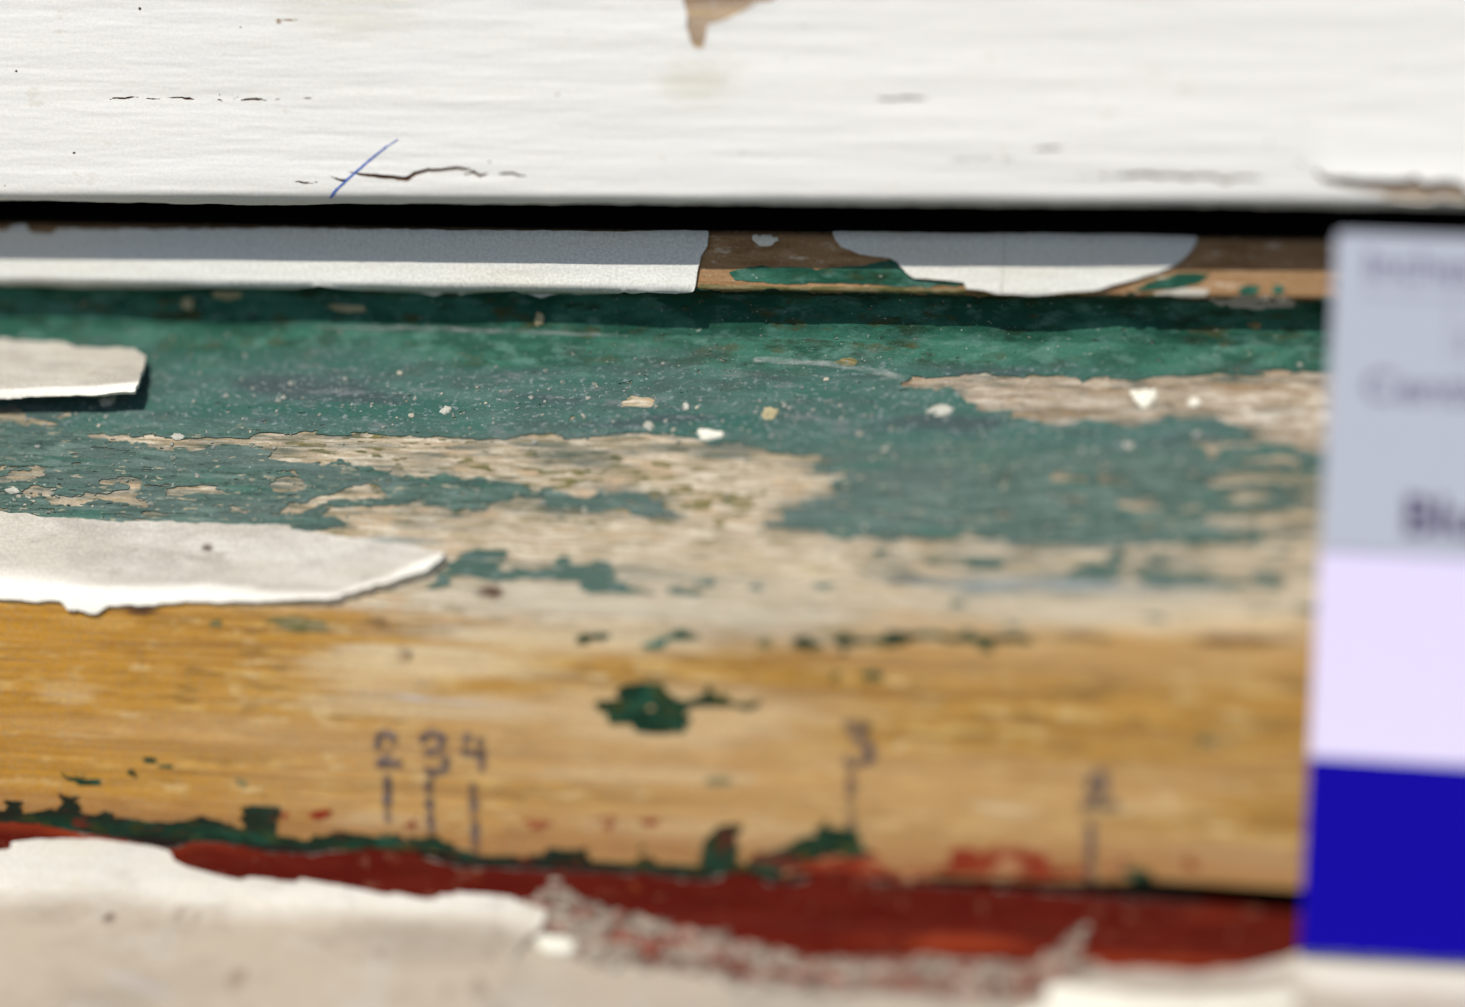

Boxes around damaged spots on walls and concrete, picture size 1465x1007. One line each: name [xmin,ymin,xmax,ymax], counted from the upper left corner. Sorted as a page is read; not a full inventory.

peeling [684,0,772,48]
crack [295,166,526,184]
crack [1081,173,1262,184]
peeling [696,234,974,295]
peeling [1113,240,1336,300]
peeling [181,297,194,310]
peeling [329,304,366,312]
peeling [534,312,544,327]
peeling [0,338,146,427]
peeling [901,370,1329,539]
peeling [0,381,842,614]
peeling [0,838,577,1007]